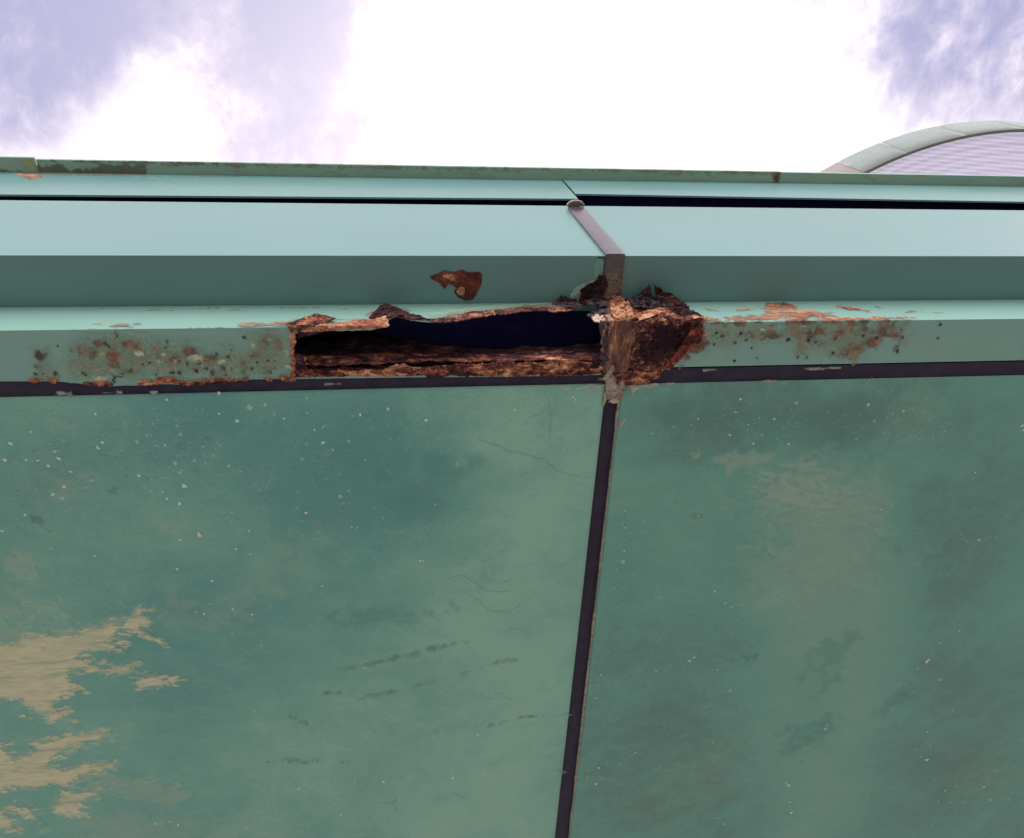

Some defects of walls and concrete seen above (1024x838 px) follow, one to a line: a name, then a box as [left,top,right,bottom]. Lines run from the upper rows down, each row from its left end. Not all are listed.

rust [28,351,60,384]
rust [138,269,672,406]
rust [705,302,916,362]